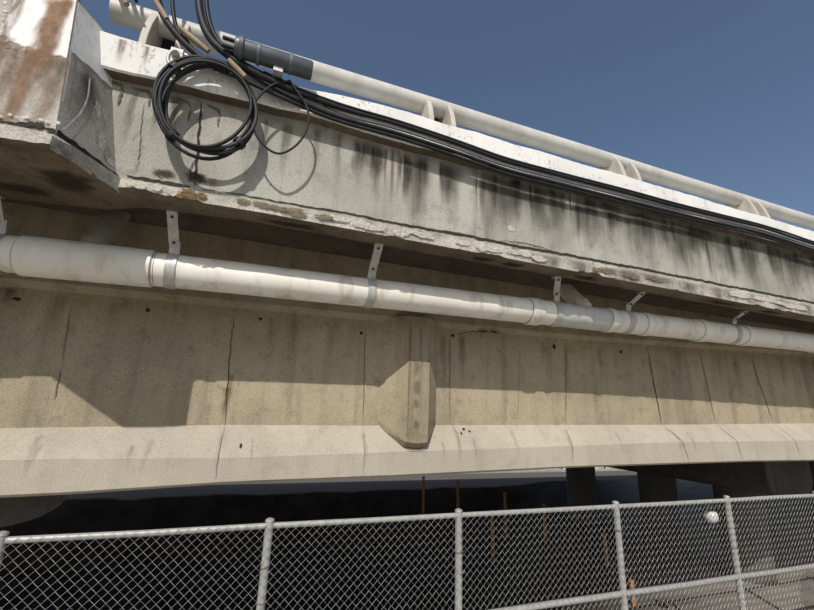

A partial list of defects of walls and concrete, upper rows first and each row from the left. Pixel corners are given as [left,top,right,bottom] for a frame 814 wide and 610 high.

corrosion [0,0,71,110]
leakage [367,146,422,182]
leakage [440,167,454,185]
spalling [236,198,434,239]
spalling [456,240,548,262]
spalling [592,267,665,283]
spalling [729,291,808,310]
crack [54,311,70,398]
crack [215,315,234,479]